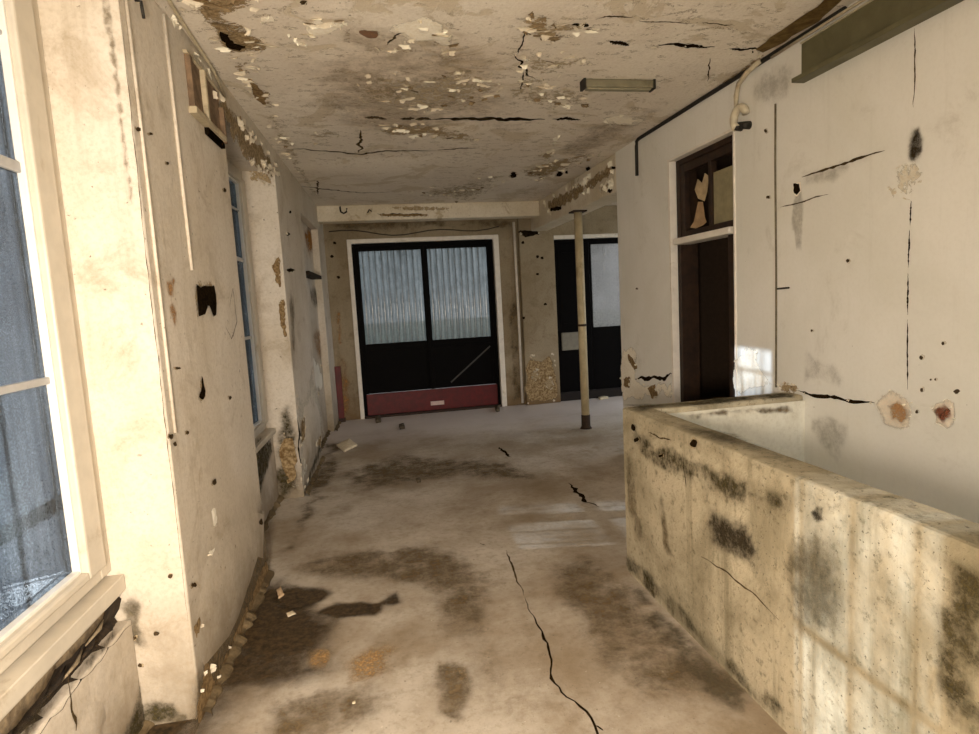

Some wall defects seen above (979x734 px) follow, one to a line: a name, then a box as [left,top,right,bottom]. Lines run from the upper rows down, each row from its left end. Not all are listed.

spalling [182,0,315,193]
crack [286,116,580,155]
peeling [356,11,600,141]
crack [905,204,913,389]
water stain [255,412,295,496]
crack [791,387,874,404]
spalling [874,389,912,429]
spalling [930,400,956,428]
water stain [709,515,754,558]
water stain [126,534,400,734]
crack [507,554,603,734]
water stain [939,566,979,715]